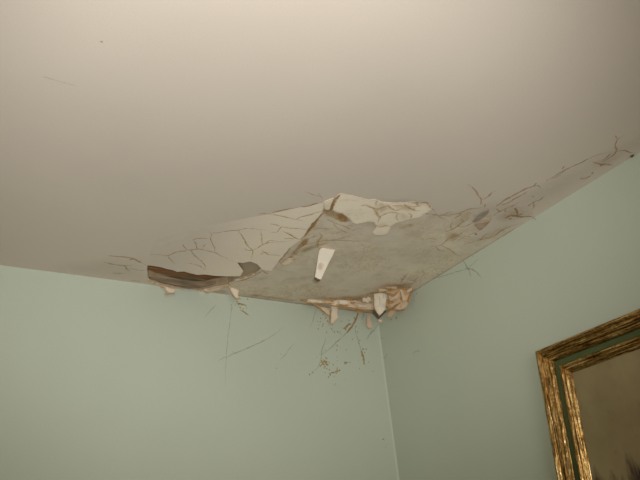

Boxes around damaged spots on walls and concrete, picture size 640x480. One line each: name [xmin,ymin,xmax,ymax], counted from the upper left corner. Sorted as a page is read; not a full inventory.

crack [157,195,340,267]
spalling [147,193,513,329]
crack [450,186,542,243]